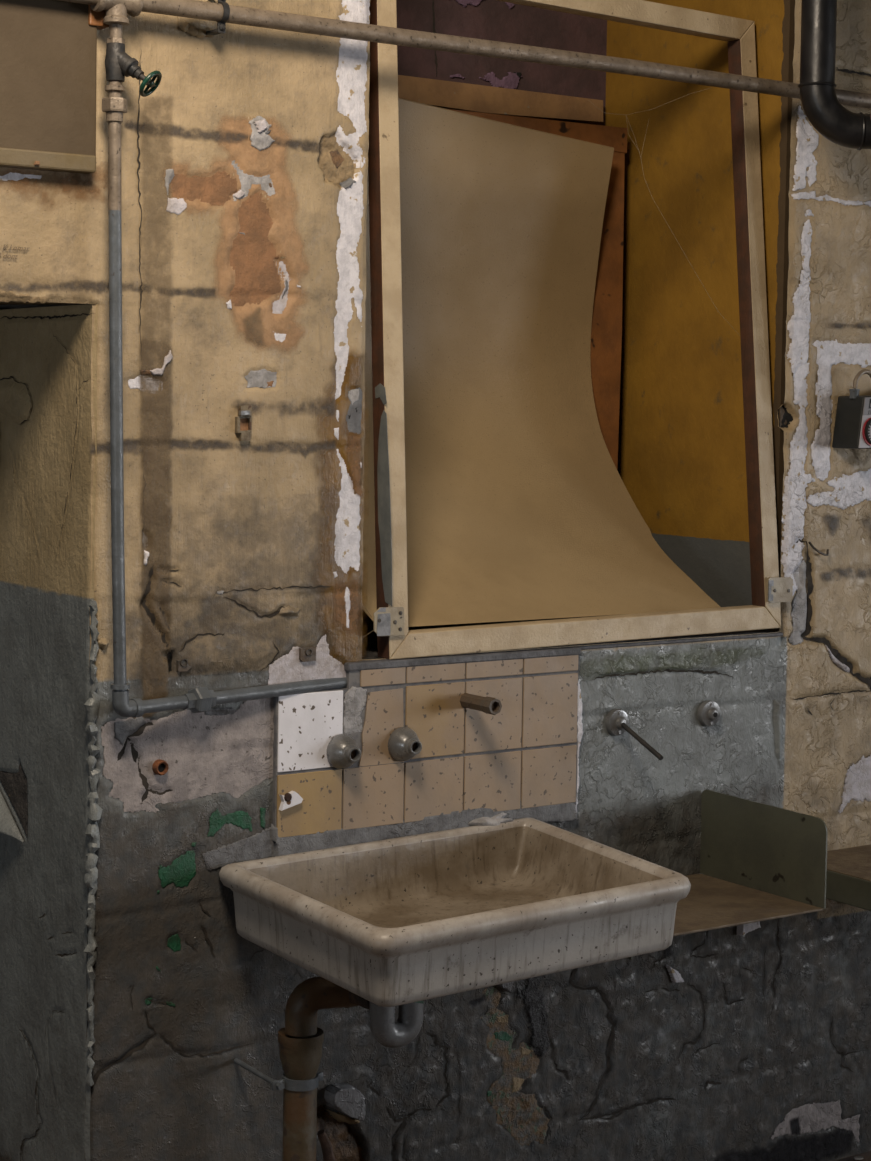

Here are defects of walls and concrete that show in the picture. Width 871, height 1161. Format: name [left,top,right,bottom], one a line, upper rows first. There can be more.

peeling [339,0,370,24]
flaking render [164,160,301,314]
peeling [318,38,368,628]
peeling [778,105,871,645]
crack [140,567,181,647]
crack [212,585,331,618]
crack [794,539,871,715]
flaking render [101,634,346,894]
crack [367,1032,461,1161]
crack [544,968,676,1120]
crack [646,919,782,1058]
flaking render [771,1100,863,1160]